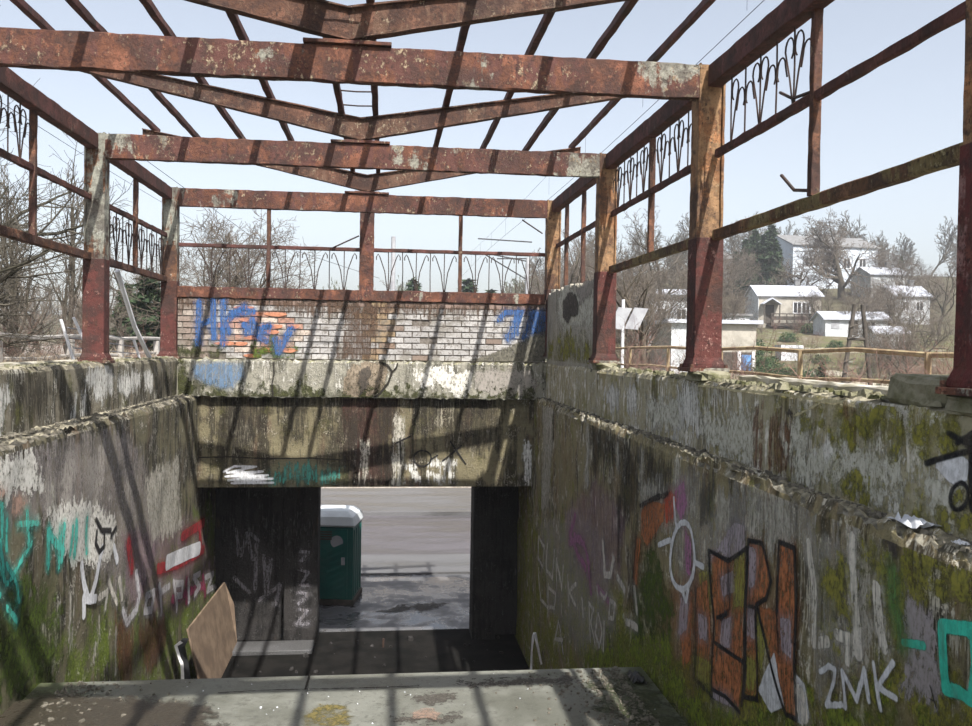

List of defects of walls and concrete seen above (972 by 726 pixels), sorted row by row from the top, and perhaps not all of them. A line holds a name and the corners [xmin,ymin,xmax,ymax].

water stain [216,366,316,454]
water stain [337,363,506,486]
water stain [541,405,554,513]
water stain [584,425,794,565]
rust [753,399,792,480]
water stain [52,593,75,651]
water stain [847,530,886,663]